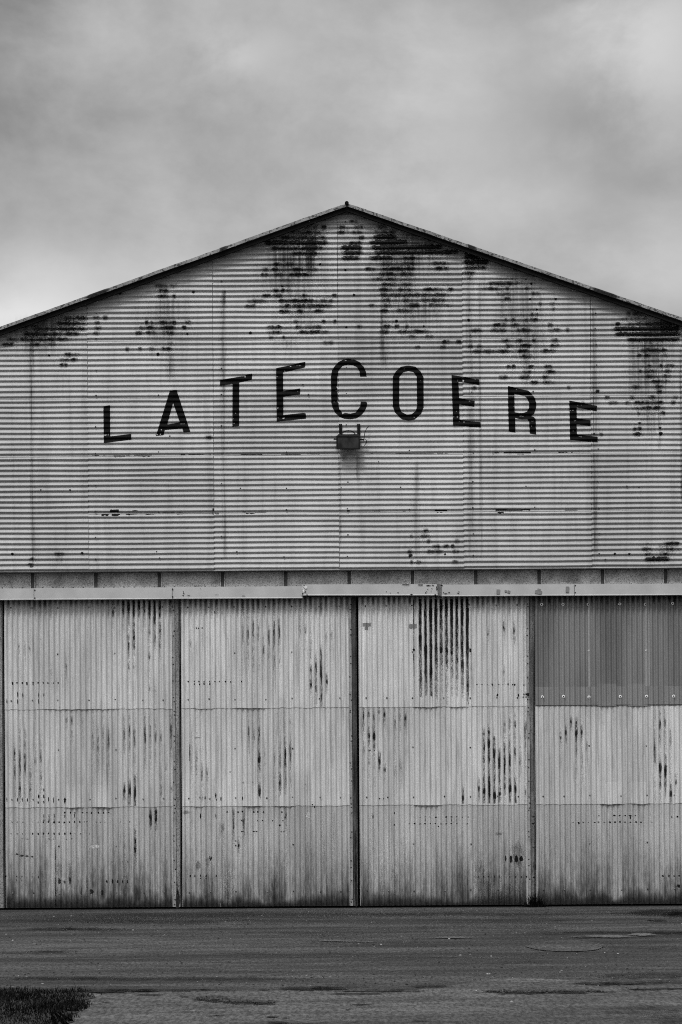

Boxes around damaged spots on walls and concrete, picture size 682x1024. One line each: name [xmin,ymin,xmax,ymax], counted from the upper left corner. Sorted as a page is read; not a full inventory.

rust [419,599,469,696]
rust [478,722,527,803]
rust [654,720,677,797]